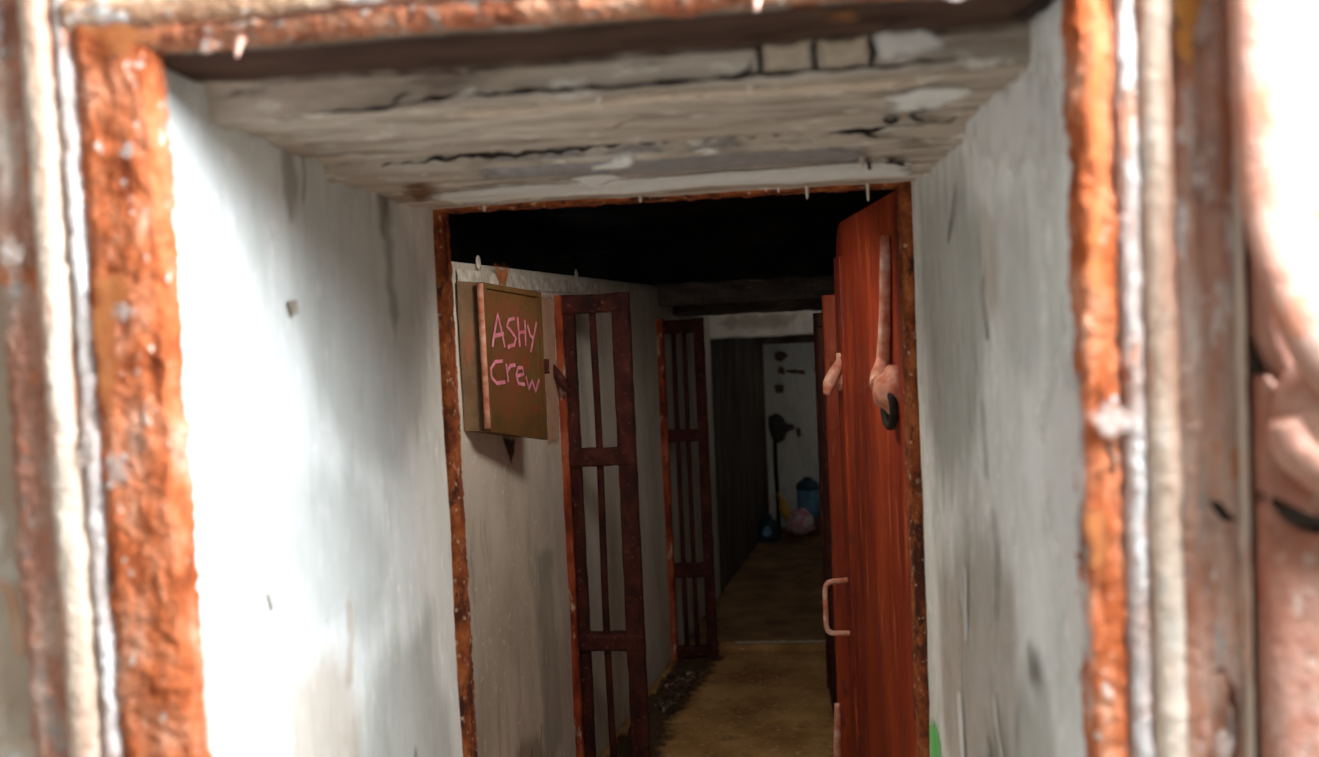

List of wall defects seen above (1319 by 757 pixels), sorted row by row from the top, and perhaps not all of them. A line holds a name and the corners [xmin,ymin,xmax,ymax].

corrosion [84,23,158,54]
corrosion [164,0,1036,82]
crack [275,39,976,120]
corrosion [1088,23,1105,162]
crack [382,134,782,167]
crack [830,109,956,170]
corrosion [1090,199,1104,315]
corrosion [93,275,130,413]
corrosion [1085,512,1108,570]